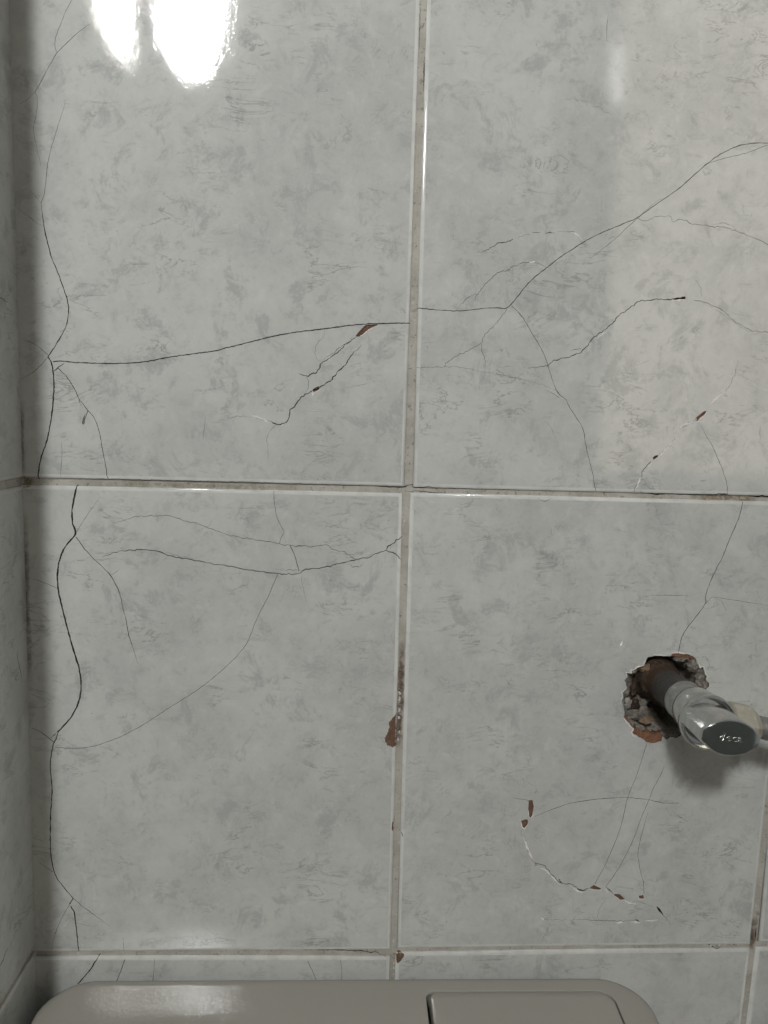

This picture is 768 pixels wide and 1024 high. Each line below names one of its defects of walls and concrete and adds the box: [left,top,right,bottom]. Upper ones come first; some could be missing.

crack [417,143,768,489]
crack [18,0,410,951]
crack [634,360,768,652]
spalling [385,715,397,747]
crack [516,744,683,924]
spalling [621,652,710,743]